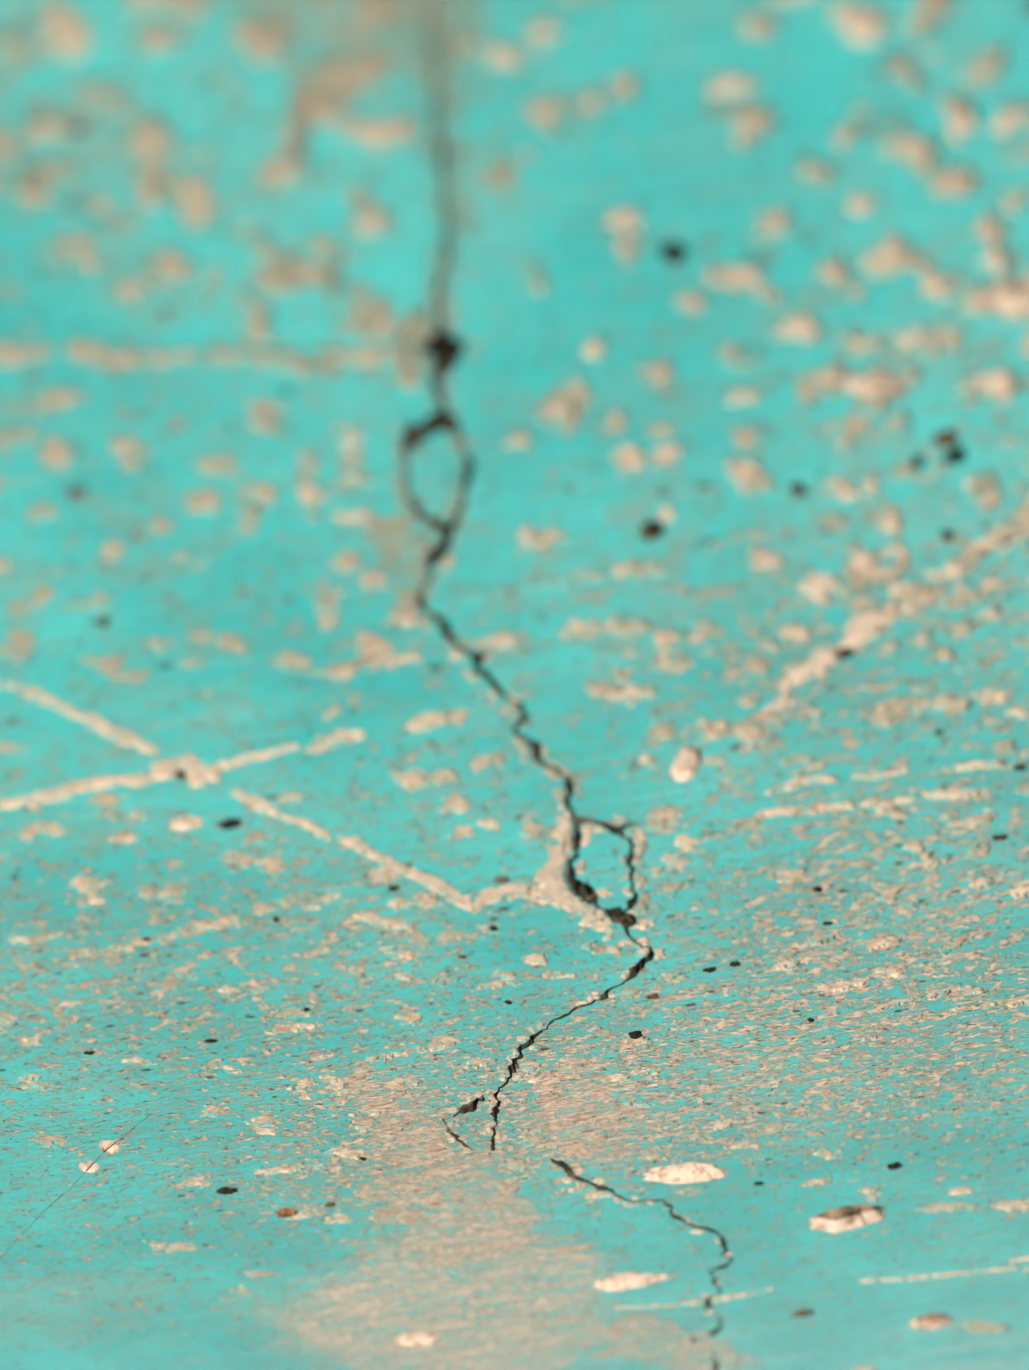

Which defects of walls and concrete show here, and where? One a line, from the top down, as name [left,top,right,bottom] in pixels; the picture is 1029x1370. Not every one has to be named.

peeling [787,0,1029,453]
crack [401,0,655,1154]
peeling [638,462,1029,782]
peeling [146,434,726,993]
peeling [7,889,344,960]
peeling [902,809,1029,899]
peeling [79,1140,121,1173]
peeling [253,1023,665,1195]
peeling [592,1272,676,1291]
crack [551,1159,734,1370]
peeling [637,1154,729,1196]
peeling [808,1186,887,1233]